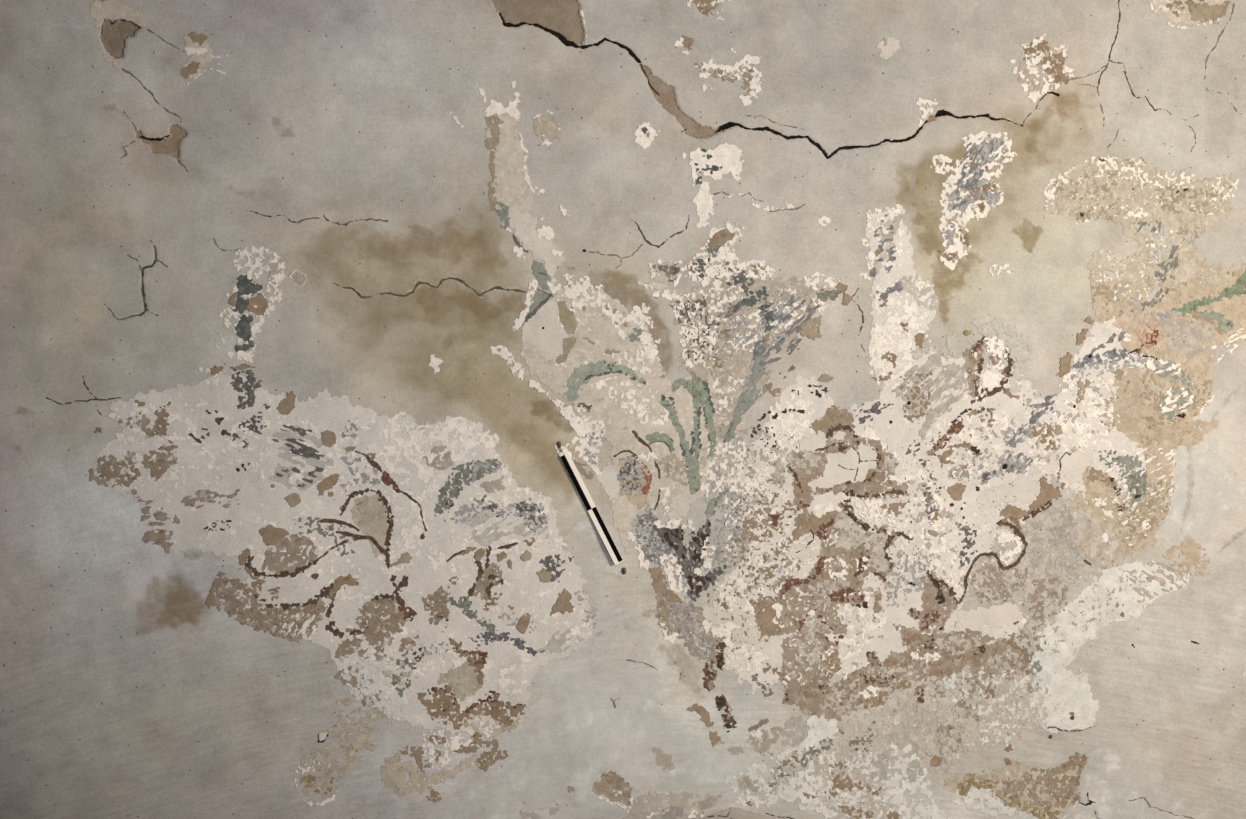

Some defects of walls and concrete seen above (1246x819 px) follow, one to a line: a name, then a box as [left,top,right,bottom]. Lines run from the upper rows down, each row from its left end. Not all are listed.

flaking render [89,0,149,71]
crack [499,12,660,96]
crack [682,0,1243,159]
flaking render [136,124,188,163]
leakage [901,147,968,198]
crack [104,240,168,320]
peeling [199,246,307,386]
crack [334,277,526,299]
leakage [914,214,974,322]
leakage [1015,226,1040,252]
flaking render [476,65,1246,819]
peeling [89,391,585,807]